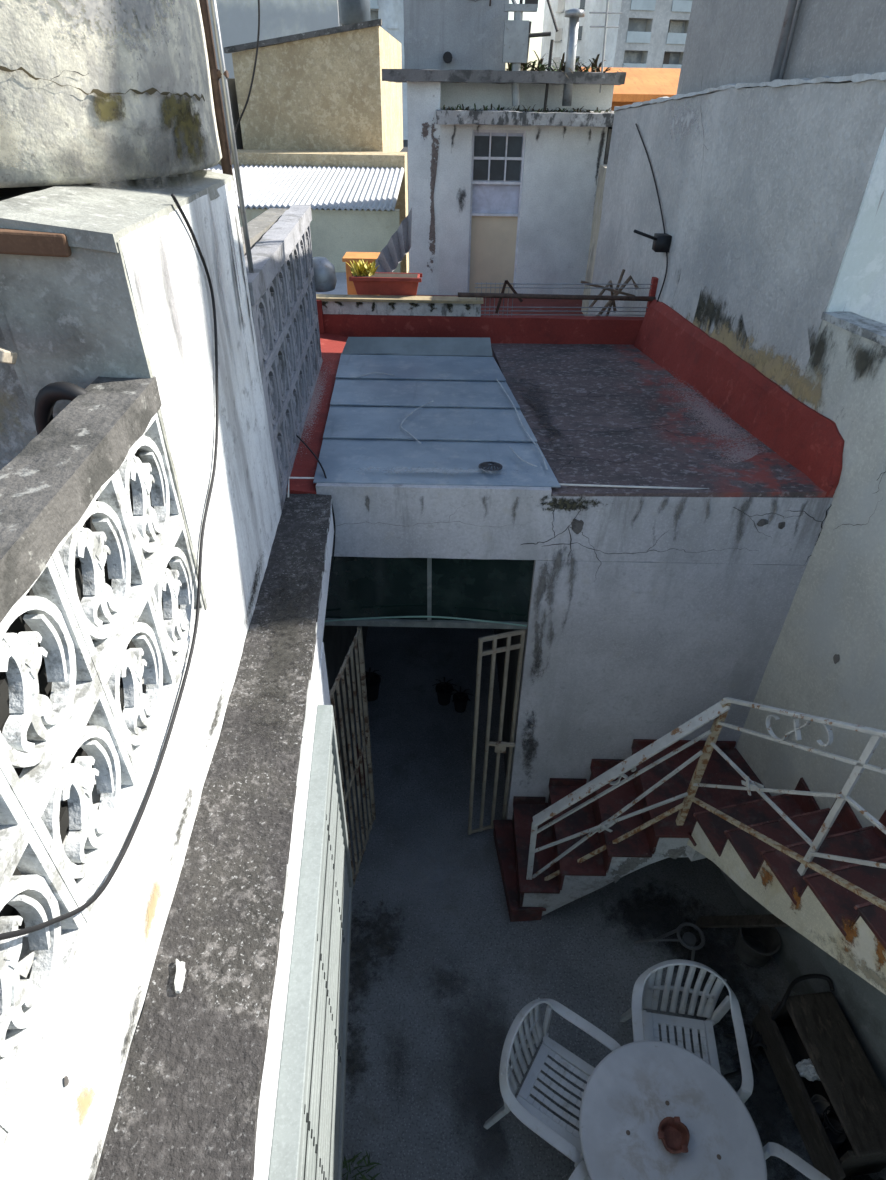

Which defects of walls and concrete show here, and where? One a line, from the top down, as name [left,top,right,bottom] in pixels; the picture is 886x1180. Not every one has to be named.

crack [0,66,205,101]
water stain [69,105,209,189]
water stain [686,318,822,409]
peeling [663,371,768,467]
crack [338,471,886,576]
water stain [531,552,575,674]
water stain [522,721,538,775]
water stain [346,904,401,1093]
rust [842,918,858,952]
rust [875,936,886,971]